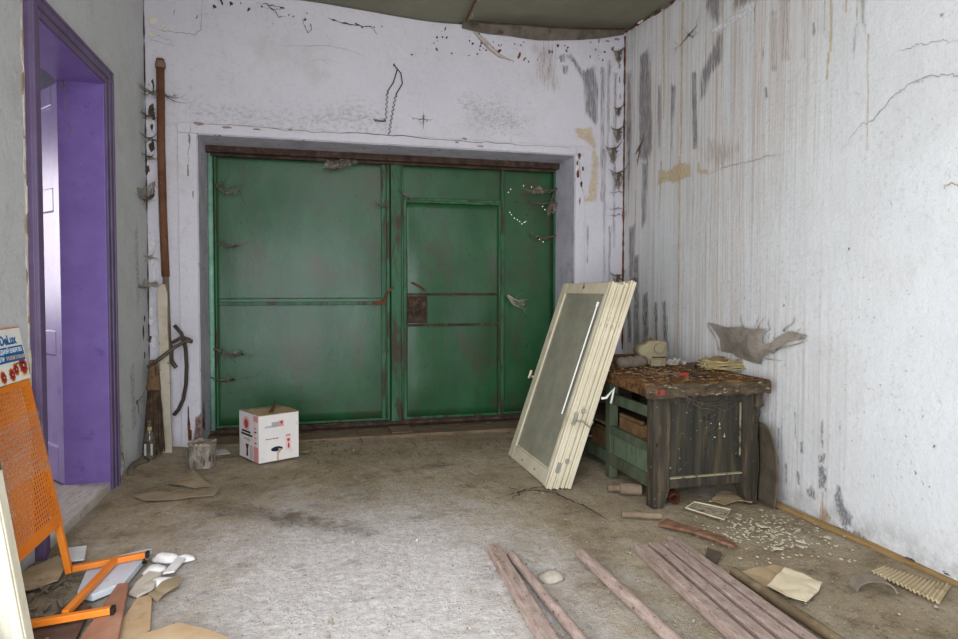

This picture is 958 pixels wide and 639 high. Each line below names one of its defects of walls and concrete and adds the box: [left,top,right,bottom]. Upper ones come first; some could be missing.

crack [622,0,675,282]
crack [842,73,958,149]
crack [509,486,609,521]